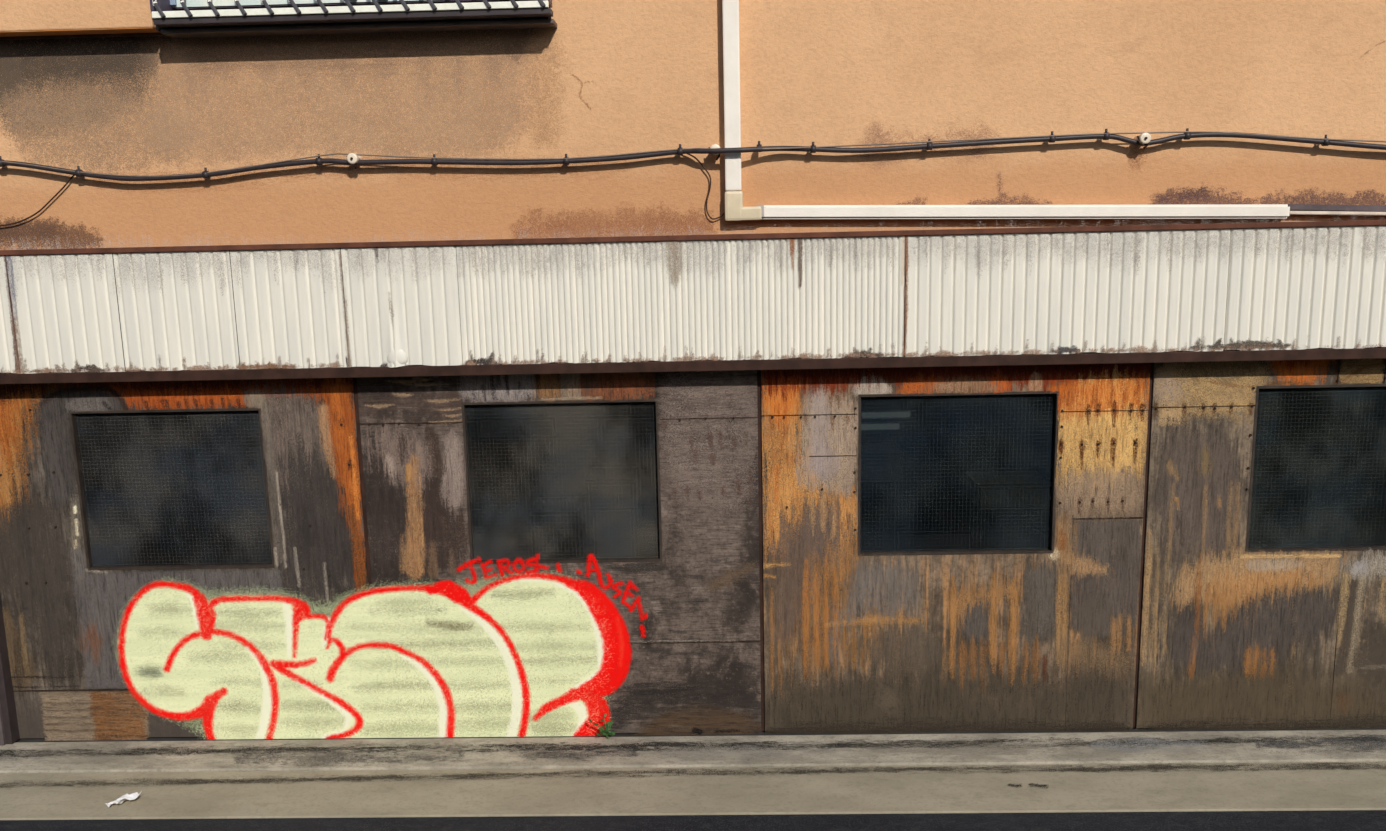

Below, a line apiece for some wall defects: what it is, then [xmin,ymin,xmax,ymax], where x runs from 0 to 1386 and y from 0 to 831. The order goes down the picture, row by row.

leakage [1150,182,1386,276]
rust [0,249,369,600]
rust [462,236,1383,697]